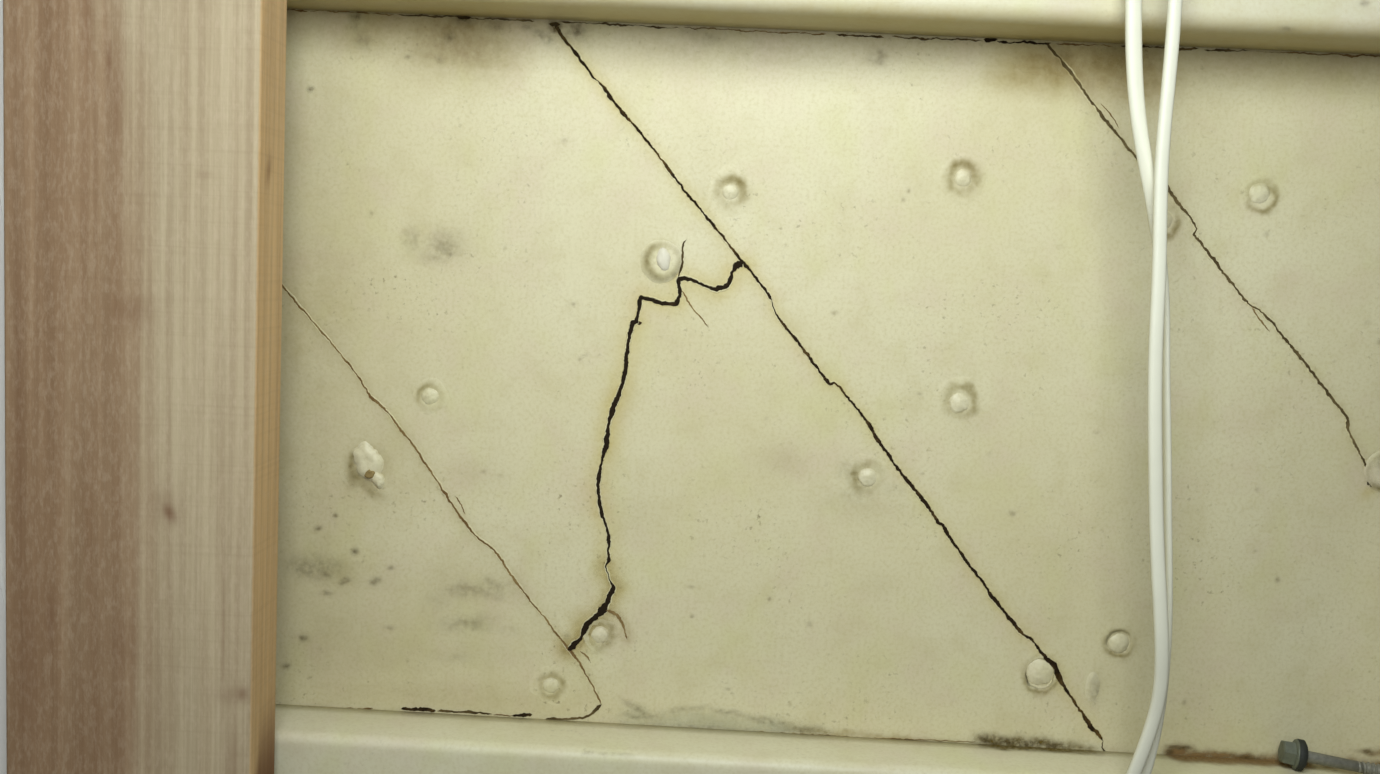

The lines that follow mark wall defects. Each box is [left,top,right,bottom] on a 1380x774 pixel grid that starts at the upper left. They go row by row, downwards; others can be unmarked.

crack [282,9,1380,751]
rust [1166,747,1311,767]